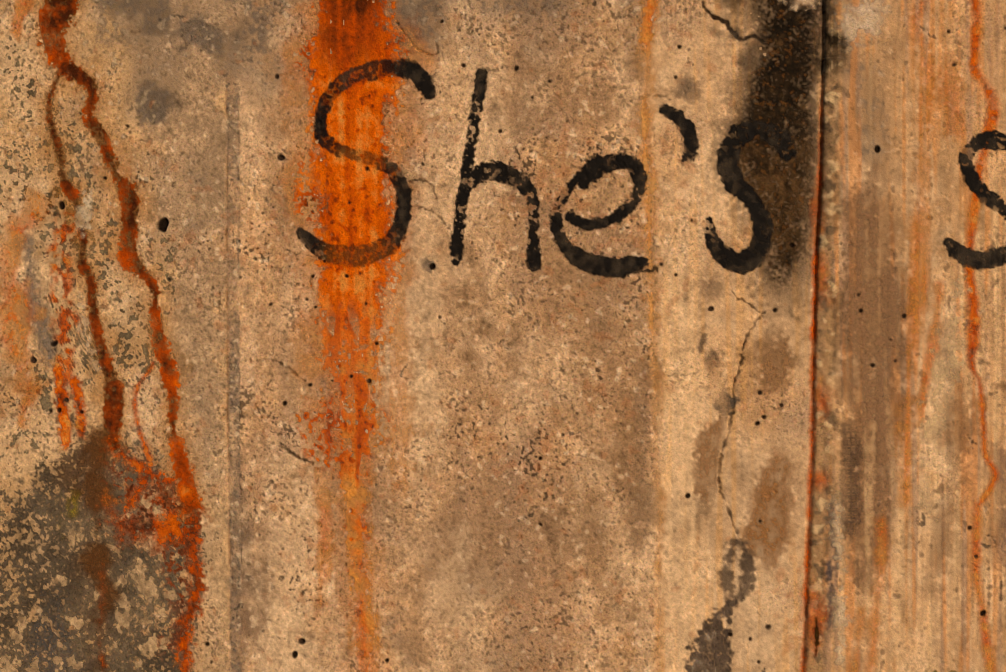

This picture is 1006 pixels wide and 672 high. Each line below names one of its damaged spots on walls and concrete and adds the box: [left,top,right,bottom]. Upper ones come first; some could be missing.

rust [35,0,206,672]
rust [291,0,412,672]
crack [702,2,758,41]
crack [718,335,748,483]
leakage [685,457,788,672]
leakage [725,0,890,290]
rust [801,165,822,672]
leakage [826,185,907,665]
rust [968,192,980,248]
rust [970,0,981,79]
rust [965,266,997,672]
rust [976,89,998,180]